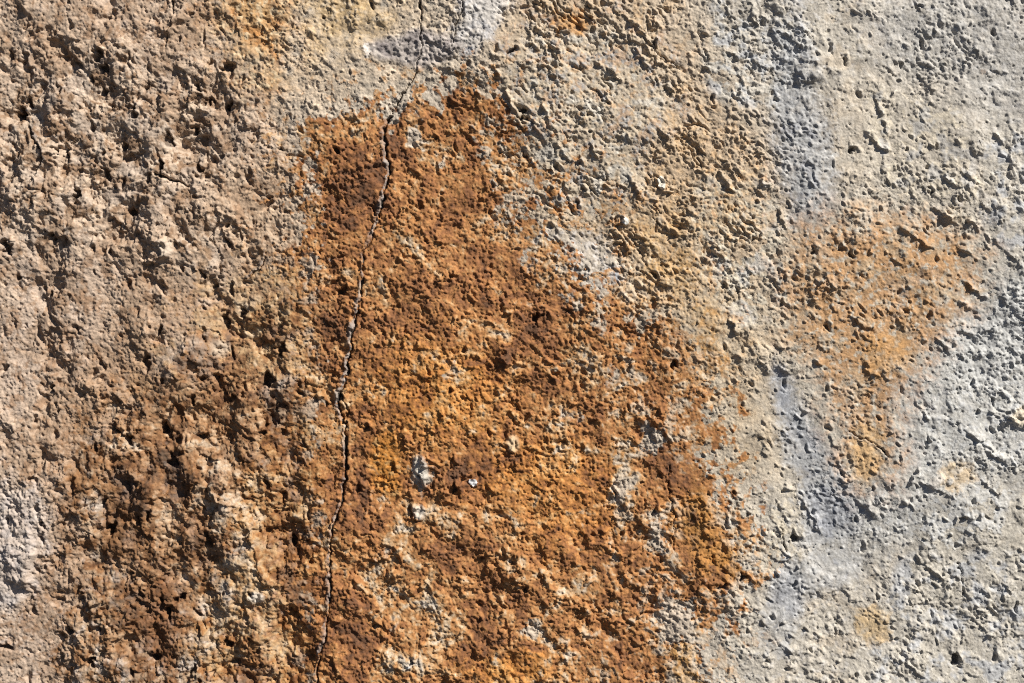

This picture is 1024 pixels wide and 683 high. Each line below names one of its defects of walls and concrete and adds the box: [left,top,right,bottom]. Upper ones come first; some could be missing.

corrosion [253,150,280,175]
crack [313,2,422,683]